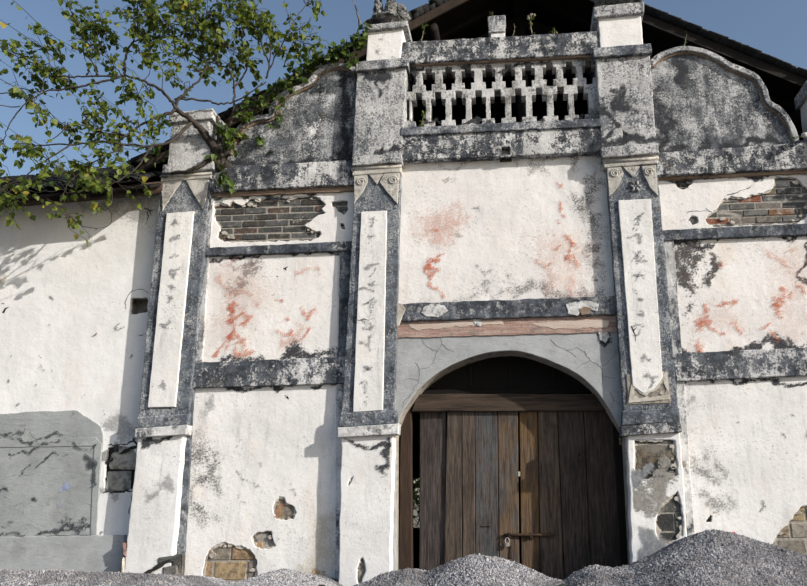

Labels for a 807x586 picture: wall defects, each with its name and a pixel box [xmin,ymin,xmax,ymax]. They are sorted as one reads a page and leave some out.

leakage [483,60,551,74]
leakage [671,56,689,90]
leakage [229,70,393,166]
spalling [214,196,348,243]
leakage [502,83,783,298]
spalling [688,177,807,227]
crack [550,339,621,408]
spalling [103,438,137,513]
spalling [273,497,296,520]
spalling [655,492,687,544]
spalling [773,505,807,555]
spalling [203,531,276,582]